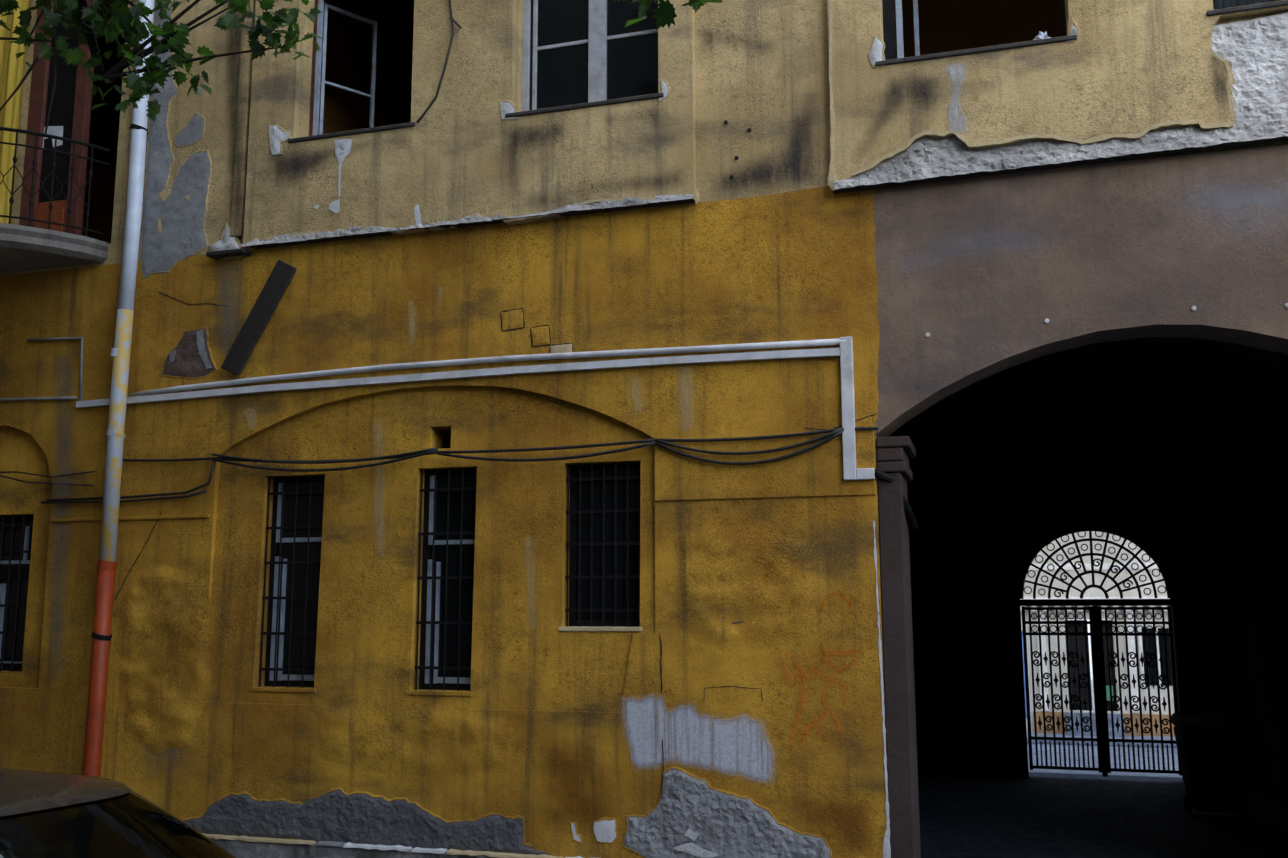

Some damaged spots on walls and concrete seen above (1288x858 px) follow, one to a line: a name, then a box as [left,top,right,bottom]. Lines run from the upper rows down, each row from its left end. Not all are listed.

peeling [139,0,700,279]
water stain [724,117,809,186]
water stain [887,80,934,107]
water stain [949,65,980,130]
spalling [828,0,1288,194]
spalling [873,521,891,858]
peeling [182,787,552,858]
peeling [570,739,832,858]